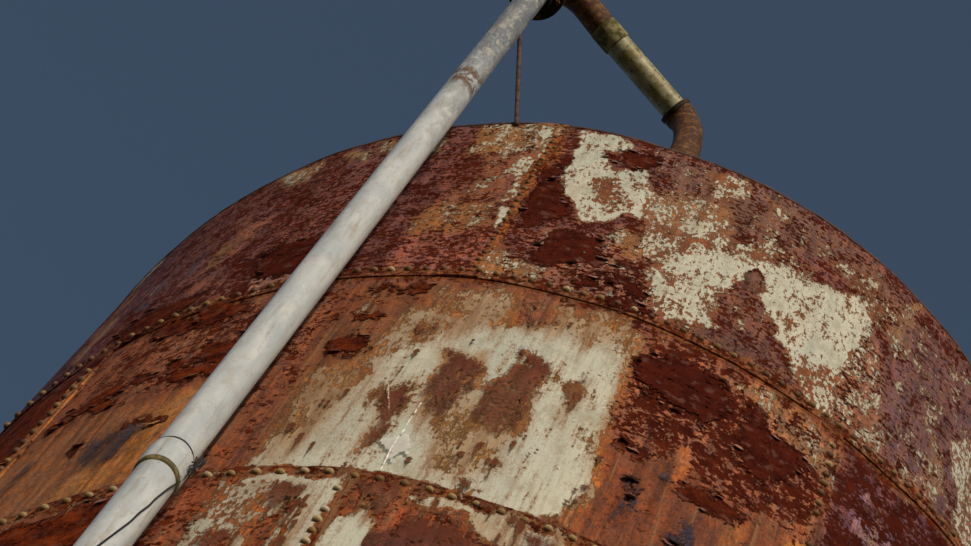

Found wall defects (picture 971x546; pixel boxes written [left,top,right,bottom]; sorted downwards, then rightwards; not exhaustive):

peeling [599,147,666,175]
peeling [516,150,657,318]
peeling [368,281,438,298]
peeling [322,310,392,359]